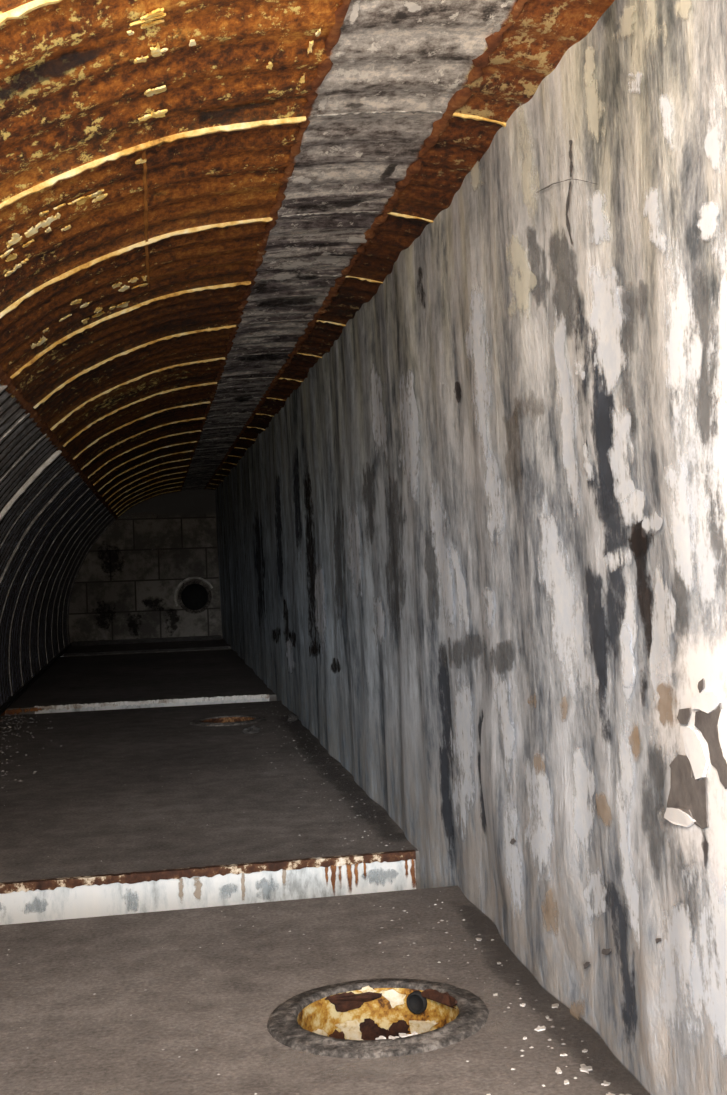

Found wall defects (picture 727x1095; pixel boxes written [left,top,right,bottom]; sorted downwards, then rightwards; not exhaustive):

peeling [127,8,166,36]
peeling [134,42,168,64]
peeling [144,85,167,97]
peeling [138,109,168,122]
peeling [0,189,108,277]
peeling [653,621,727,899]
corrosion [179,877,202,899]
corrosion [325,862,366,893]
corrosion [405,859,416,888]